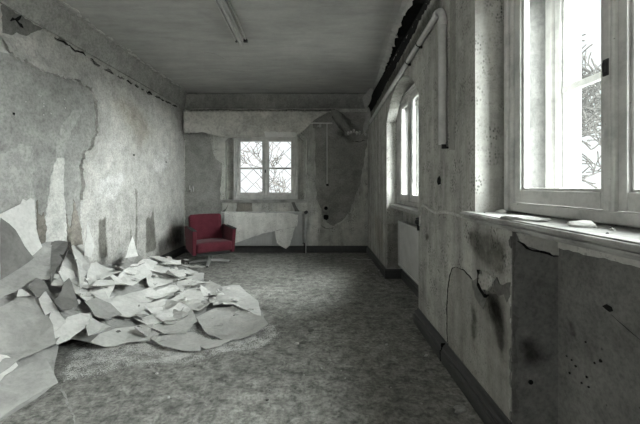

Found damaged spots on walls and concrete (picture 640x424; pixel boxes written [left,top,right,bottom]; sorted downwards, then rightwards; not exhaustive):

crack [54,37,177,107]
peeling [0,4,104,259]
peeling [236,203,252,212]
peeling [312,111,368,229]
peeling [446,267,513,421]